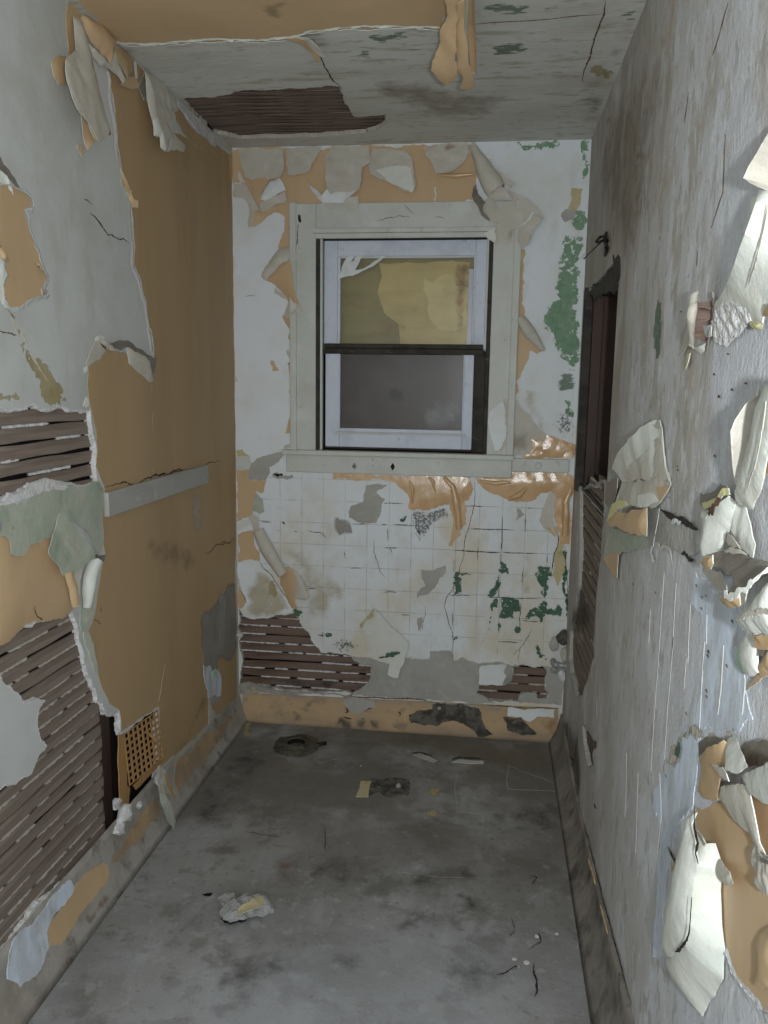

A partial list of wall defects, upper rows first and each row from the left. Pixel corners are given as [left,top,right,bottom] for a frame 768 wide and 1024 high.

crack [481,6,605,81]
crack [84,199,129,243]
flaking render [561,188,588,230]
peeling [680,134,768,369]
crack [104,460,219,488]
peeling [0,0,580,987]
crack [344,483,568,663]
peeling [333,384,768,1024]